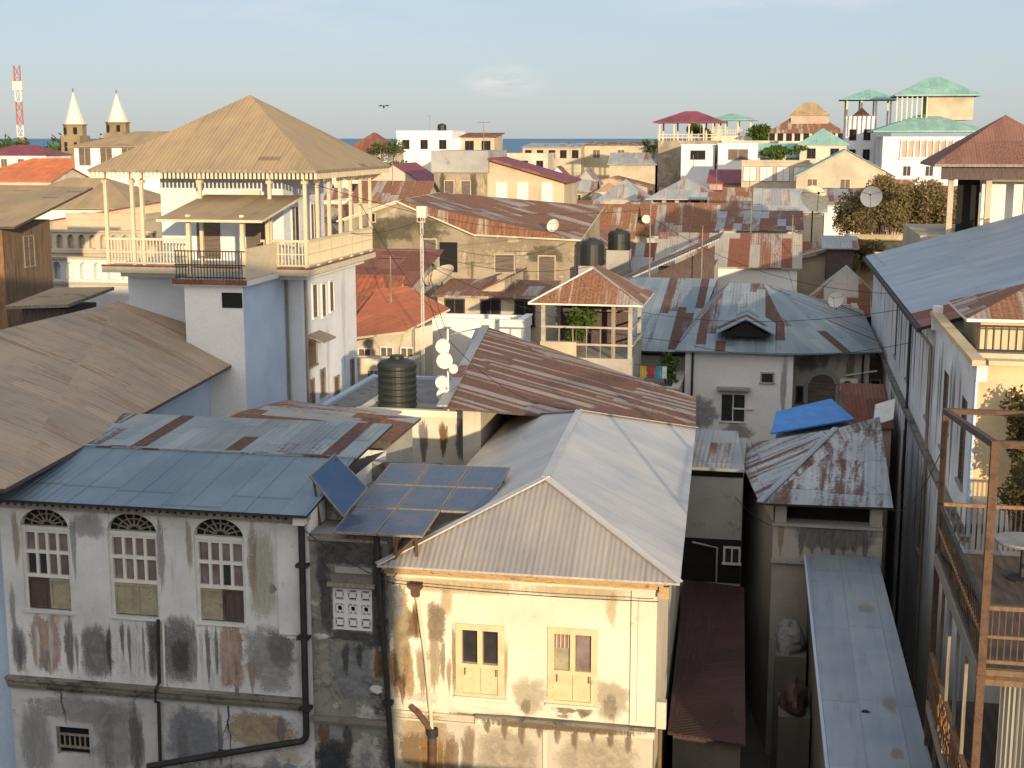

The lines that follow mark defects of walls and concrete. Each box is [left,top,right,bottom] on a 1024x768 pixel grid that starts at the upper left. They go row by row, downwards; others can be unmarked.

leakage [798,527,882,557]
leakage [10,586,26,672]
peeling [28,613,61,674]
leakage [63,616,218,685]
peeling [219,623,244,693]
leakage [244,628,296,692]
leakage [407,604,456,692]
leakage [23,700,144,768]
leakage [479,695,641,768]